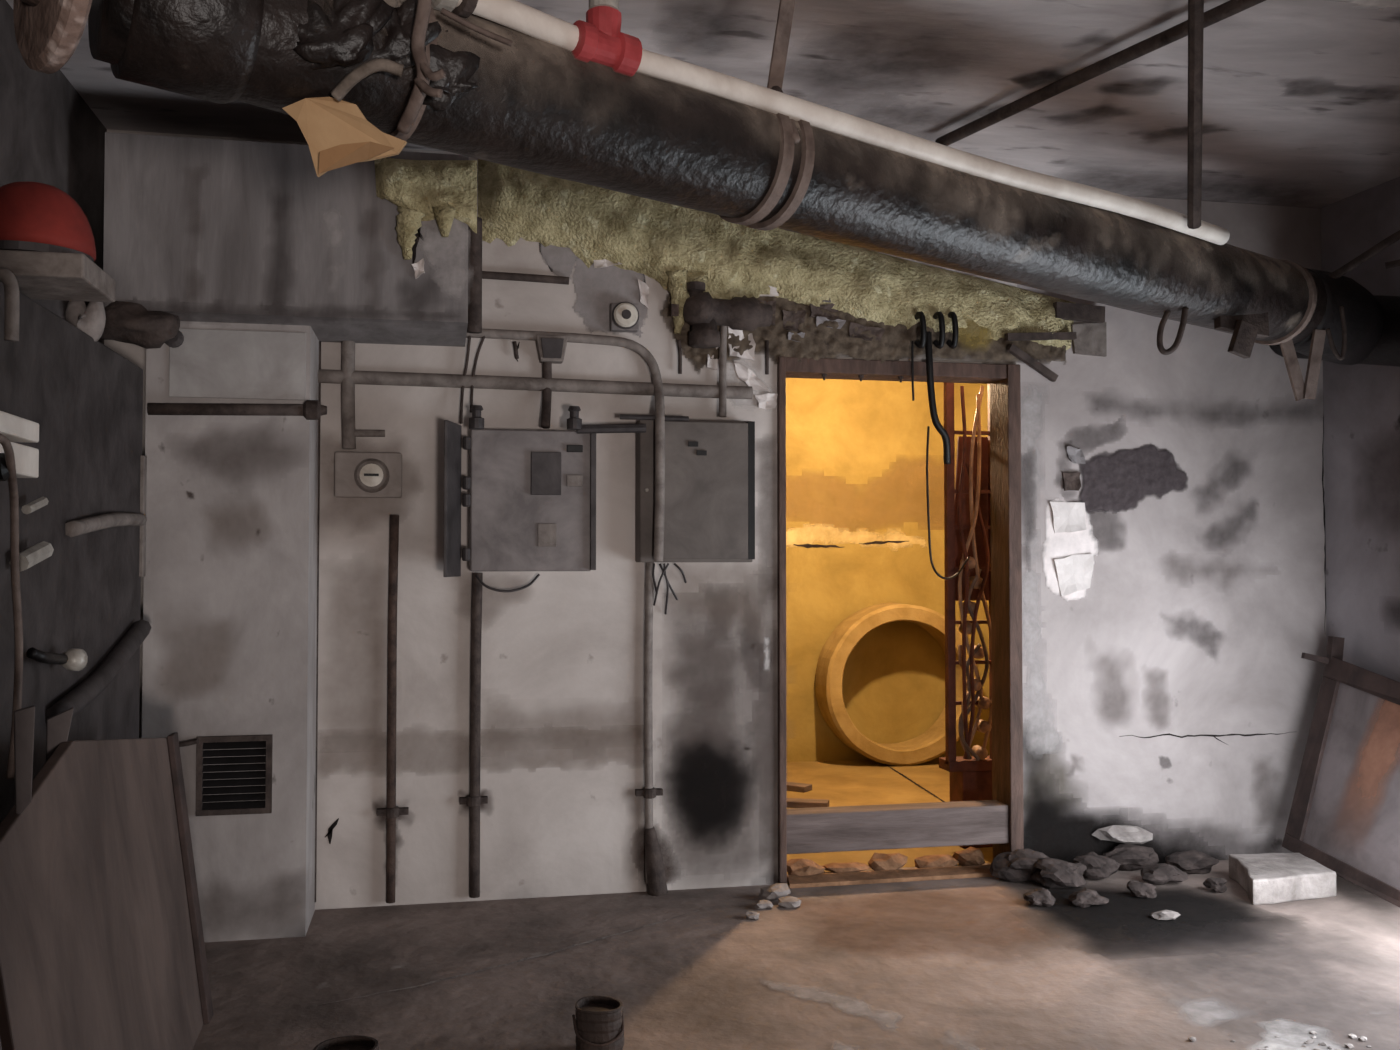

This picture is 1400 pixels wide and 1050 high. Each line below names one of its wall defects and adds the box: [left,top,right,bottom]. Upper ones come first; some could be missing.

flaking render [539,242,1066,409]
flaking render [1022,389,1188,754]
damp [1023,753,1219,864]